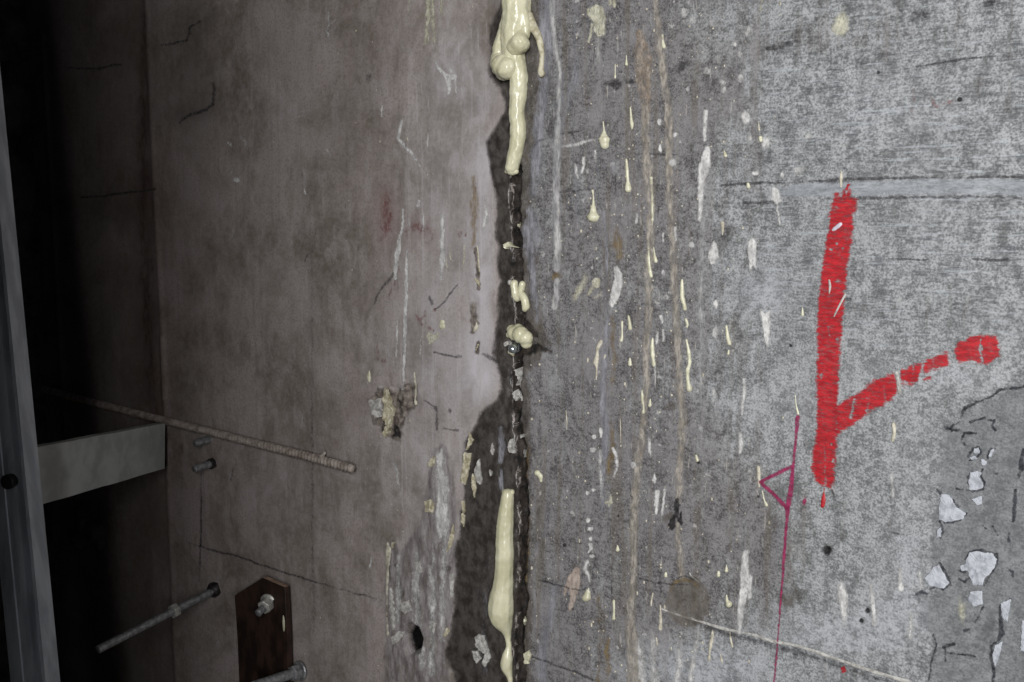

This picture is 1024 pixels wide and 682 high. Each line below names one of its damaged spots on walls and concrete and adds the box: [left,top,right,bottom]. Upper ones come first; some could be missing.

crack [179,84,215,124]
damp [445,0,576,682]
spalling [368,372,417,440]
crack [503,163,594,682]
peeling [936,386,1024,541]
crack [195,496,334,588]
peeling [915,549,998,632]
peeling [990,599,1011,682]